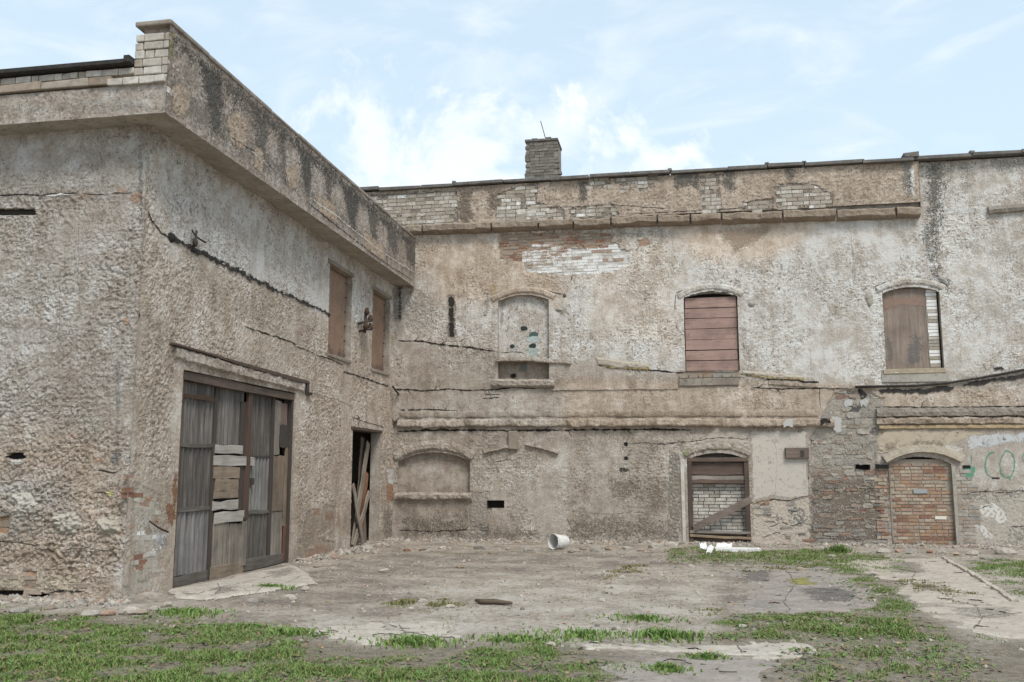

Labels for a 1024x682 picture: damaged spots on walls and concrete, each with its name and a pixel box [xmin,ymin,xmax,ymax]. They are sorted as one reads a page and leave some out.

crack [0,183,169,238]
leakage [168,31,440,335]
flaking render [370,189,459,227]
flaking render [495,183,631,275]
flaking render [743,182,834,213]
leakage [900,160,1023,292]
crack [245,326,748,518]
flaking render [753,389,1024,555]